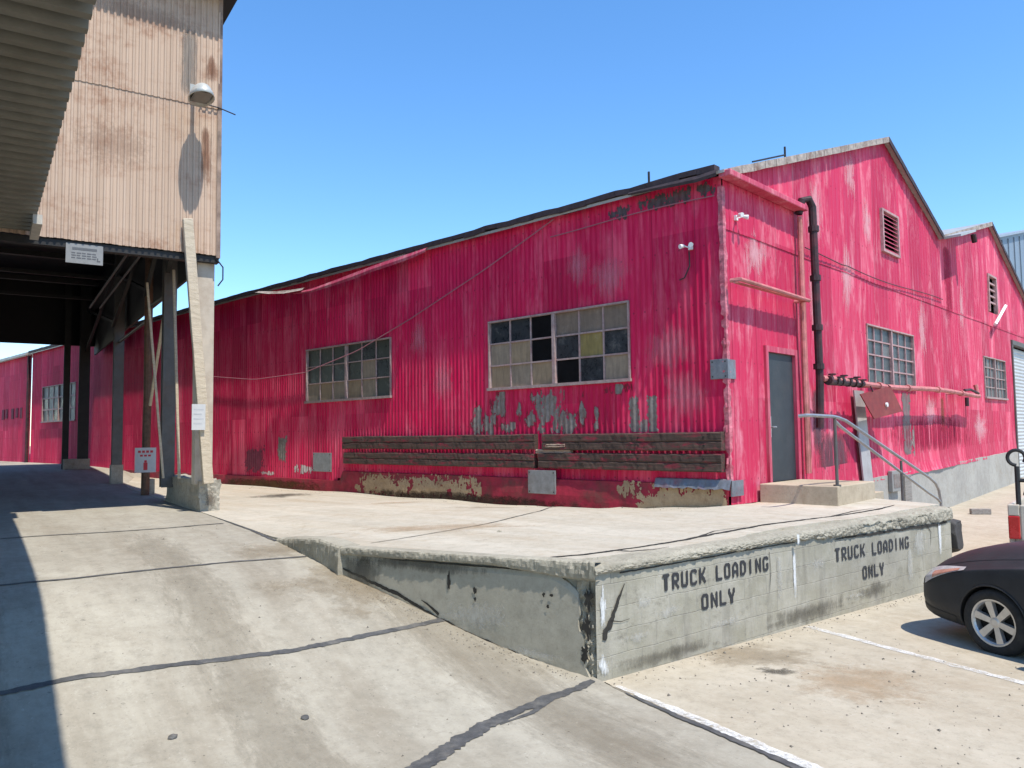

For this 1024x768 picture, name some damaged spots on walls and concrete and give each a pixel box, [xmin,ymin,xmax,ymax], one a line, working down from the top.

peeling [470,389,599,435]
peeling [604,383,658,432]
peeling [355,472,482,497]
peeling [617,458,729,508]
crack [552,505,947,641]